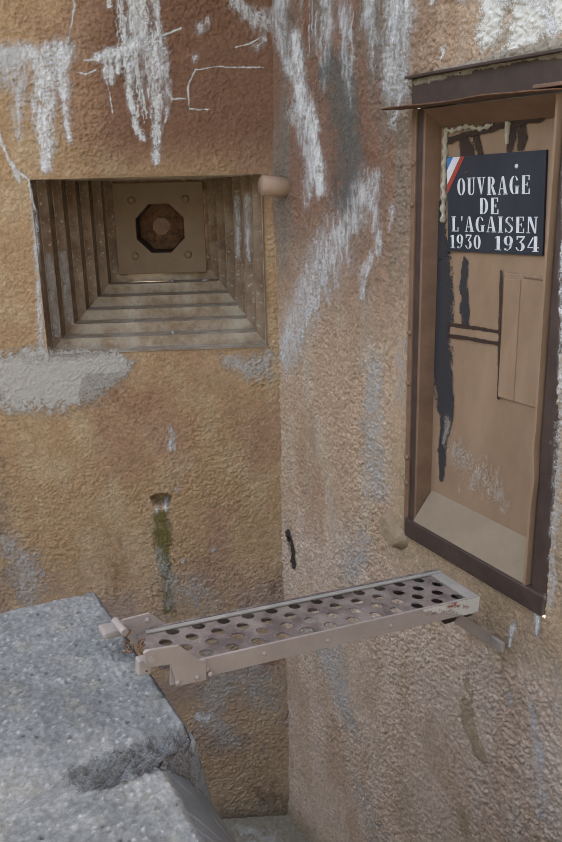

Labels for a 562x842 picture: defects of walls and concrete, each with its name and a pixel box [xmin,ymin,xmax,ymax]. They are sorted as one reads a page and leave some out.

peeling [46,253,73,338]
peeling [0,345,136,417]
damp [152,497,217,615]
spalling [63,724,201,793]